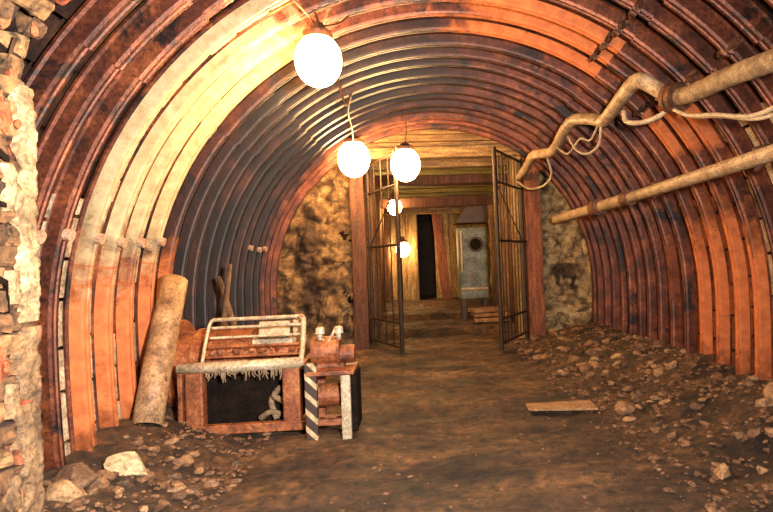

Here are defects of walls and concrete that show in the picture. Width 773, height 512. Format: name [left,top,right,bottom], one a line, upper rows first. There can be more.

rust [442,0,625,78]
rust [640,104,720,158]
rust [661,237,680,302]
rust [684,199,771,380]
rust [69,251,174,451]